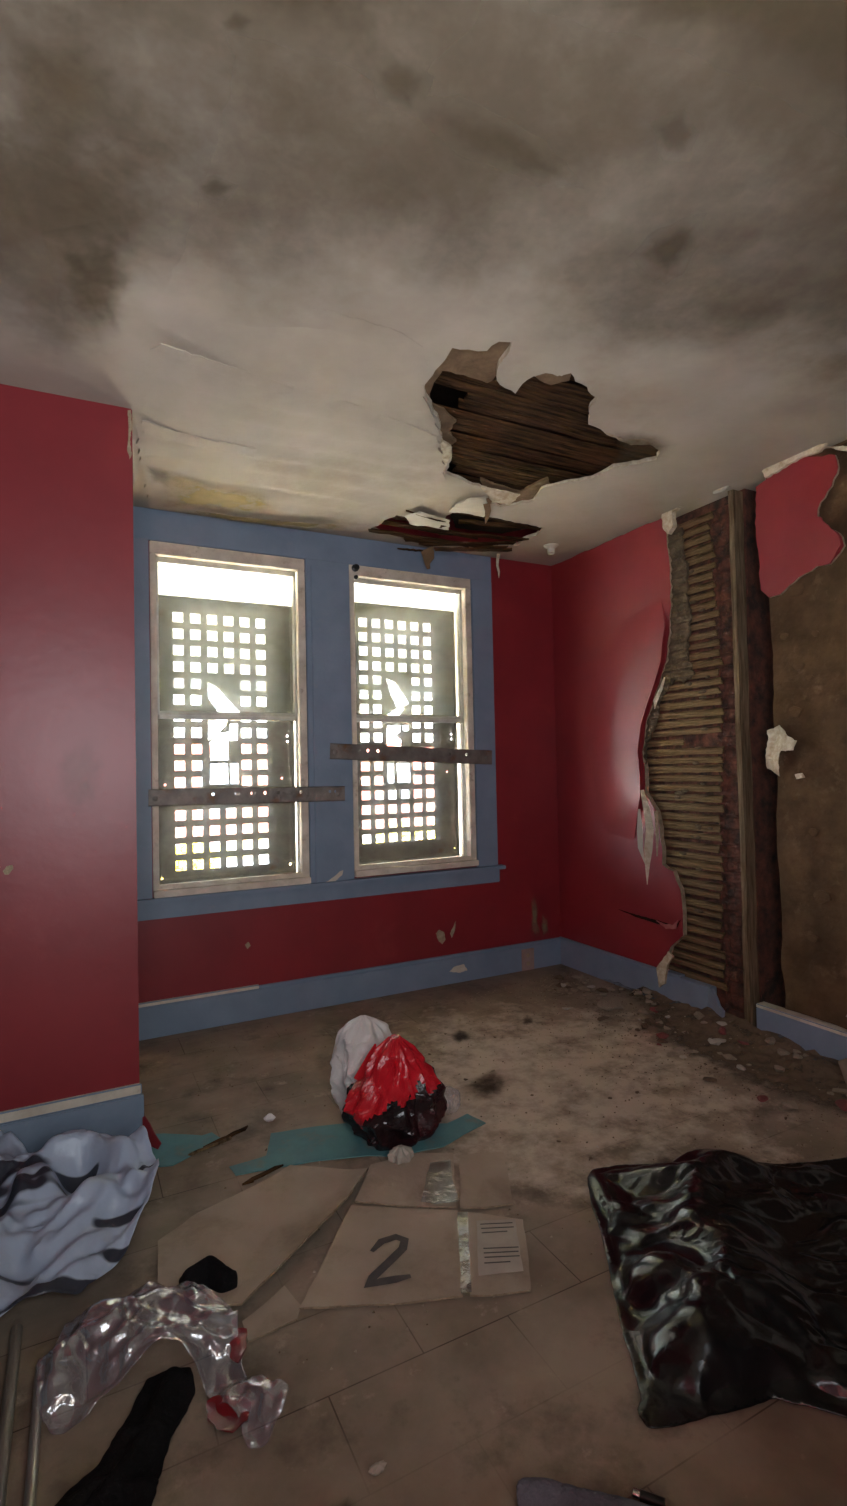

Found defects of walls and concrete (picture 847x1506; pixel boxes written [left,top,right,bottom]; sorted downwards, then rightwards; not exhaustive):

flaking render [637,485,745,1019]
spalling [755,442,847,1030]